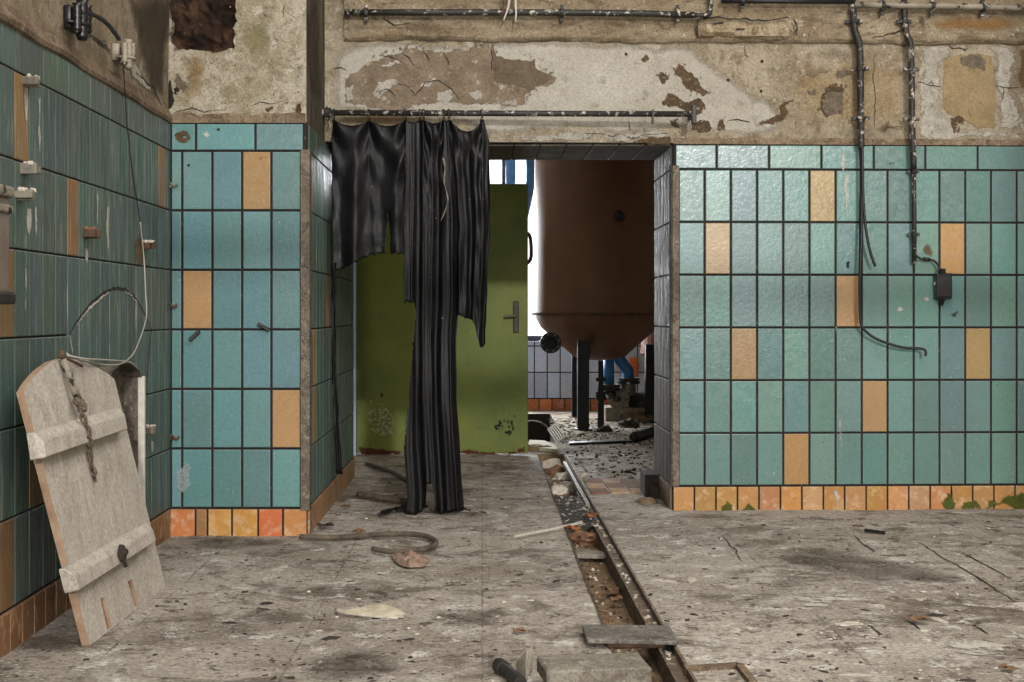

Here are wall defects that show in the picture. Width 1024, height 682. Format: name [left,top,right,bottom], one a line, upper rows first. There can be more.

flaking render [169,0,237,53]
peeling [345,41,557,110]
peeling [607,63,725,146]
peeling [759,100,794,125]
flaking render [806,67,849,117]
flaking render [951,116,964,133]
crack [916,541,1017,602]